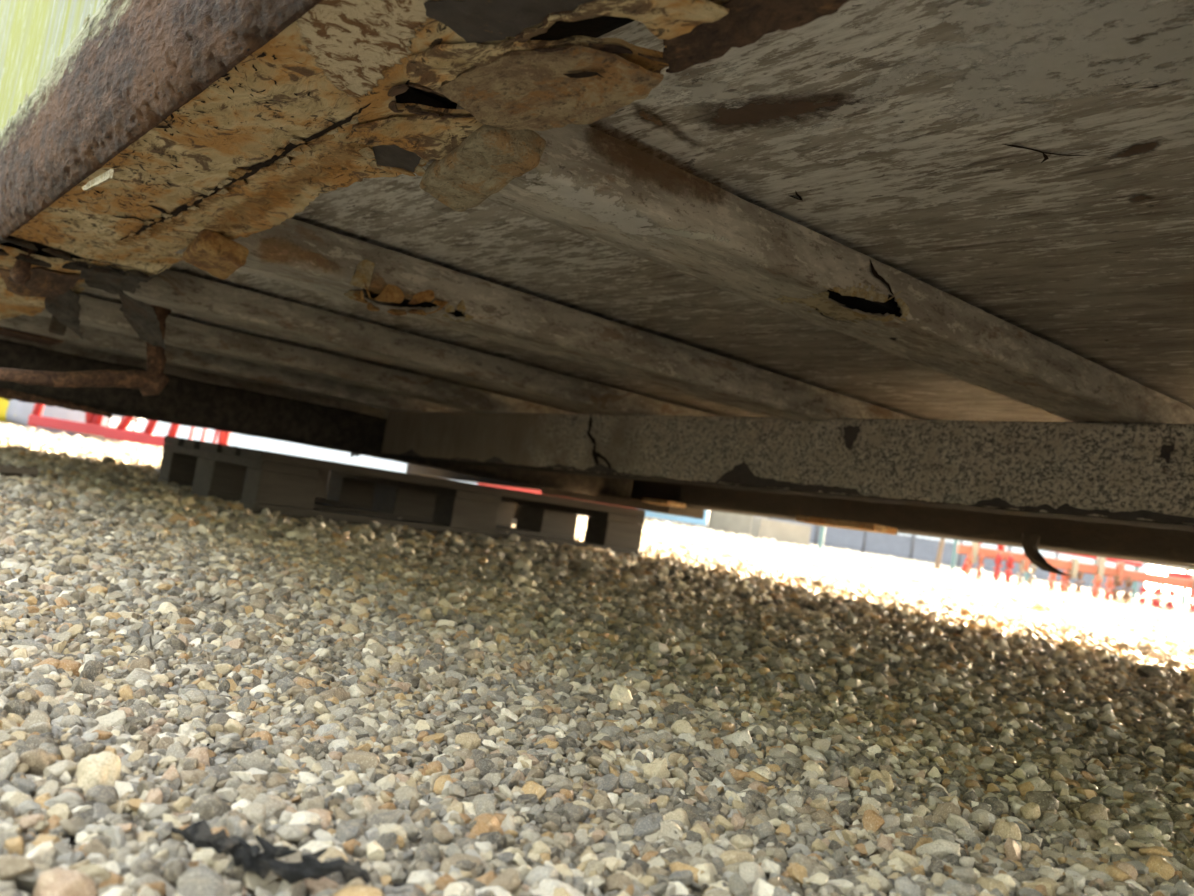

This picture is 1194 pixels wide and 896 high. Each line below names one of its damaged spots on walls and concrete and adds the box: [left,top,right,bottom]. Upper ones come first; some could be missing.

peeling [406,0,729,91]
crack [71,52,371,241]
peeling [345,115,483,177]
peeling [81,169,114,191]
peeling [808,287,909,323]
crack [587,414,612,474]